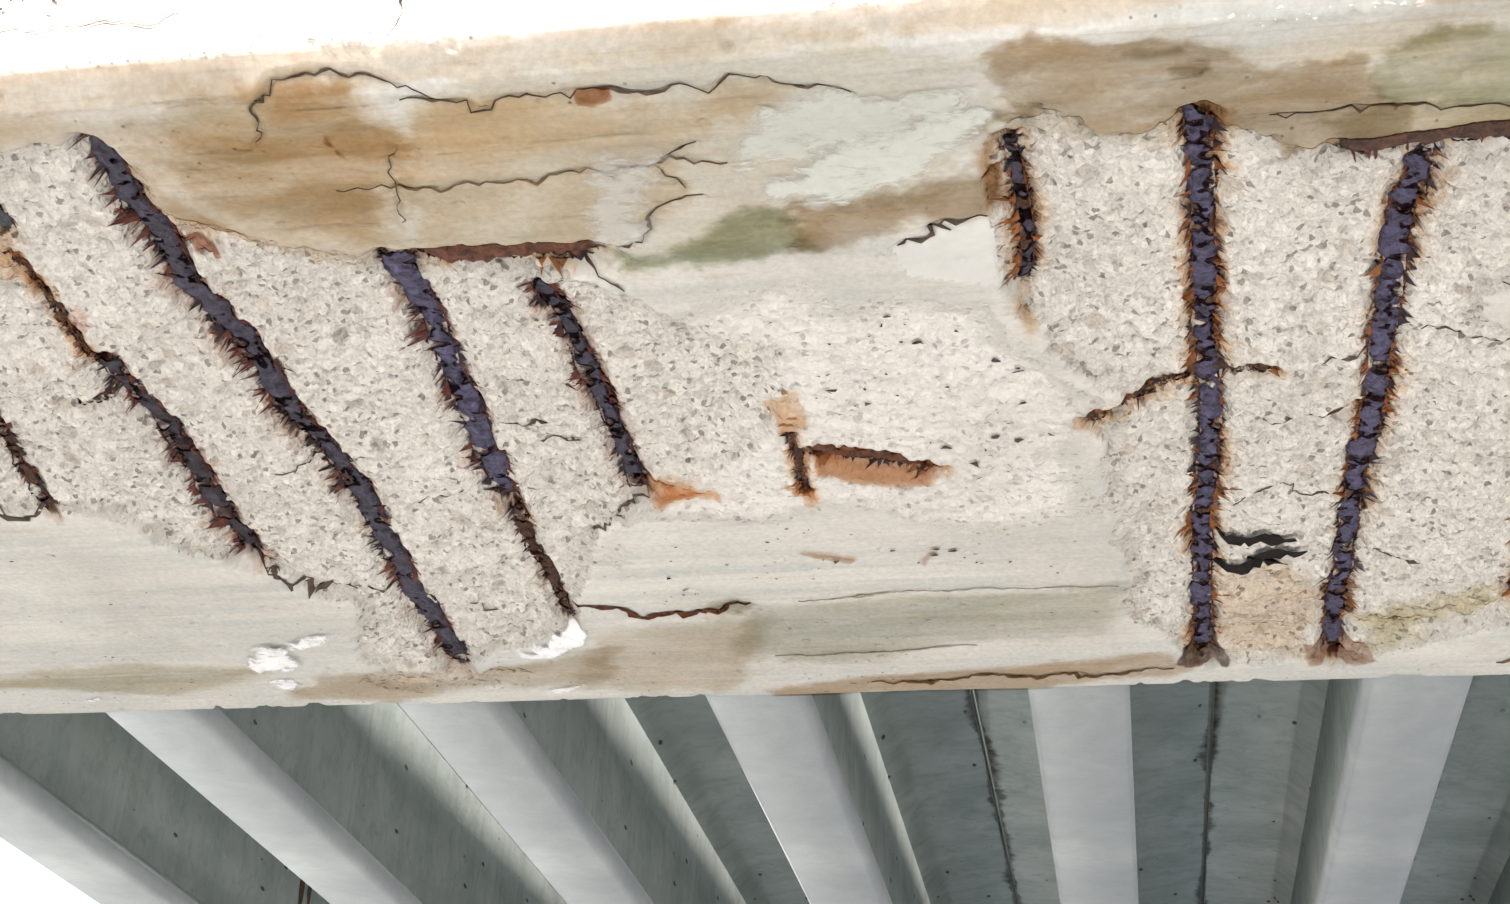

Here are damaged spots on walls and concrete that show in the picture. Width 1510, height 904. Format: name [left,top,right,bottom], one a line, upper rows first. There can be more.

crack [0,12,181,33]
crack [249,68,851,142]
leakage [739,90,994,205]
crack [1269,101,1510,119]
crack [336,141,727,292]
leakage [593,161,654,245]
spalling [0,133,952,693]
spalling [889,103,1510,668]
corrosion [1180,634,1228,667]